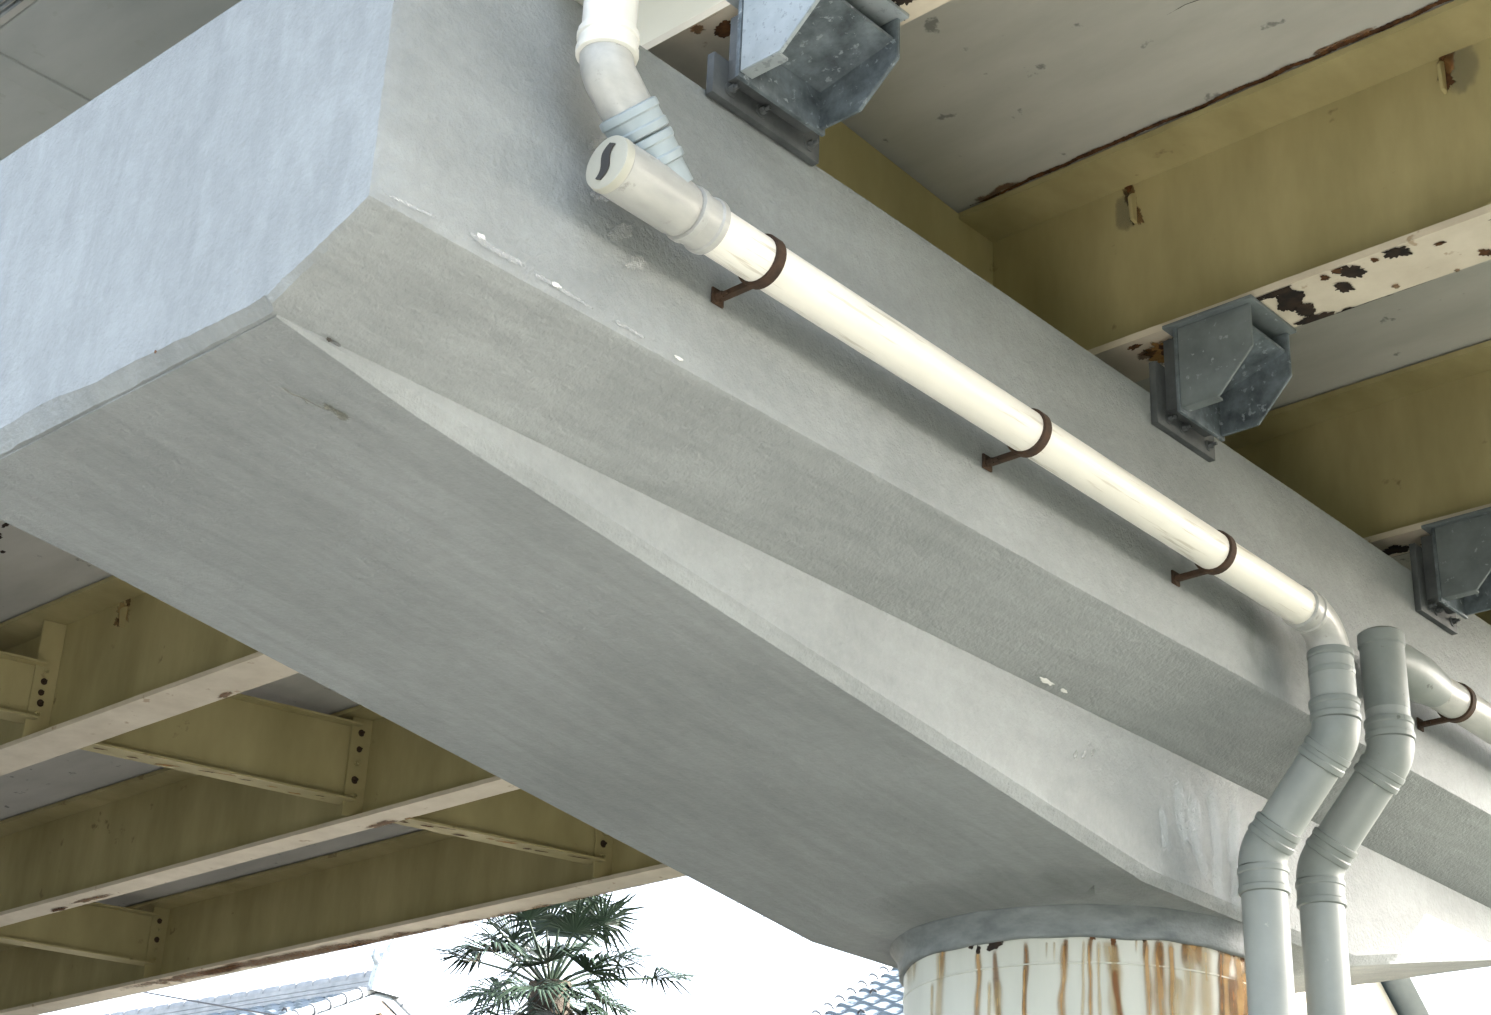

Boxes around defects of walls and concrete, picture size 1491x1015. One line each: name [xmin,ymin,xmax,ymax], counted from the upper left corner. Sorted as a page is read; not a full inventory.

peeling [1256,246,1429,325]
rust [931,951,944,1015]
rust [975,953,1000,1015]
rust [1059,939,1122,1015]
rust [1136,940,1248,1015]